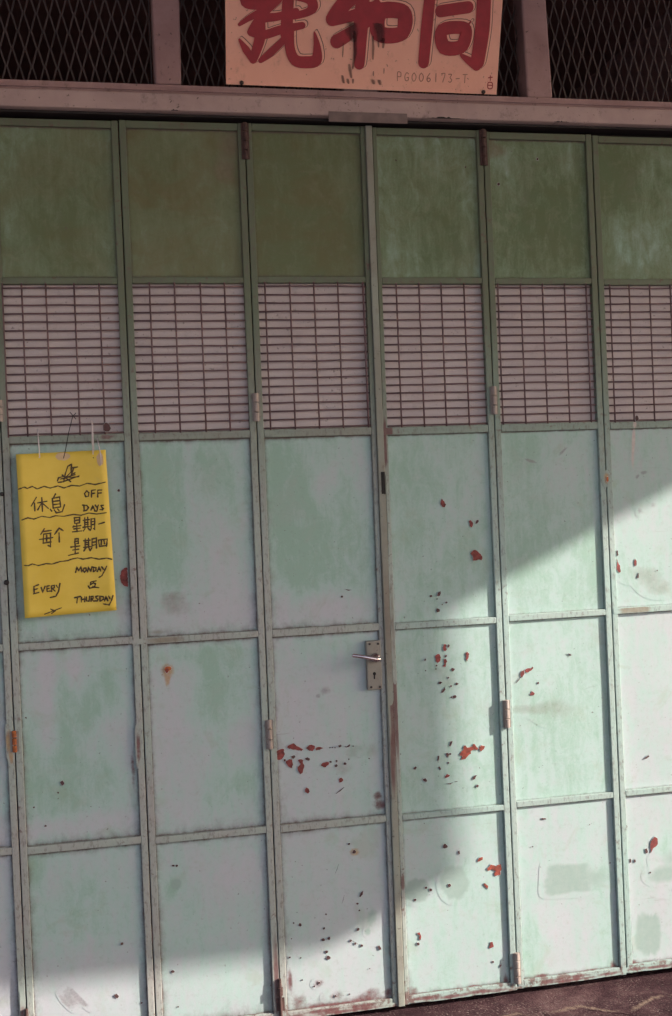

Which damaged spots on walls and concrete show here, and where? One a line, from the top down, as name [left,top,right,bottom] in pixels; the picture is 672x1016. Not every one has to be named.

corrosion [156,659,179,690]
peeling [424,644,459,699]
peeling [277,743,354,794]
peeling [437,741,485,785]
peeling [477,857,502,876]